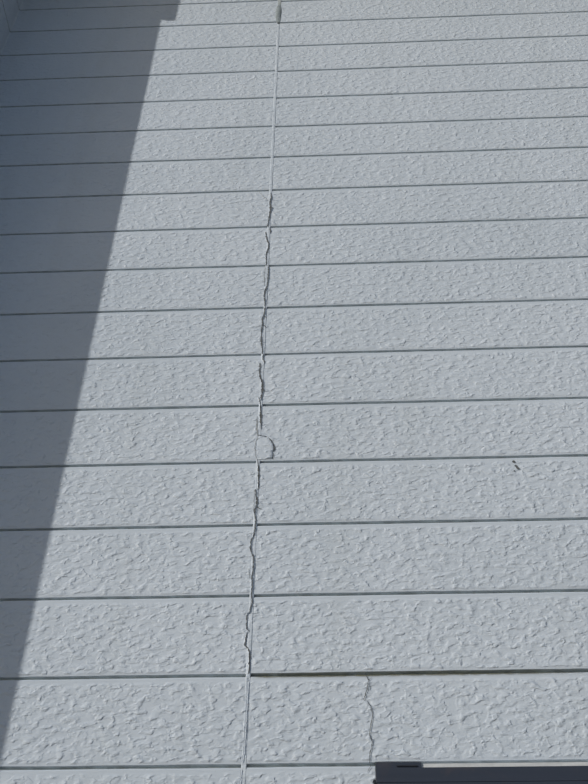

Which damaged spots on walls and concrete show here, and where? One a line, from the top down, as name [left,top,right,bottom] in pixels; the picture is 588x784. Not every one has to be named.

crack [244,192,275,673]
crack [364,673,373,770]